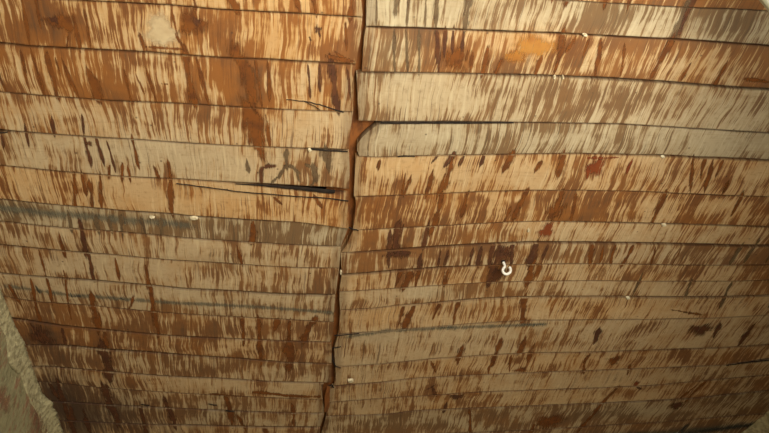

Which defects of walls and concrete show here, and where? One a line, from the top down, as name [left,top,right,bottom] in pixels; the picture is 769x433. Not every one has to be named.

crack [286,99,344,113]
crack [176,183,349,202]
damp [0,206,189,237]
crack [332,333,359,368]